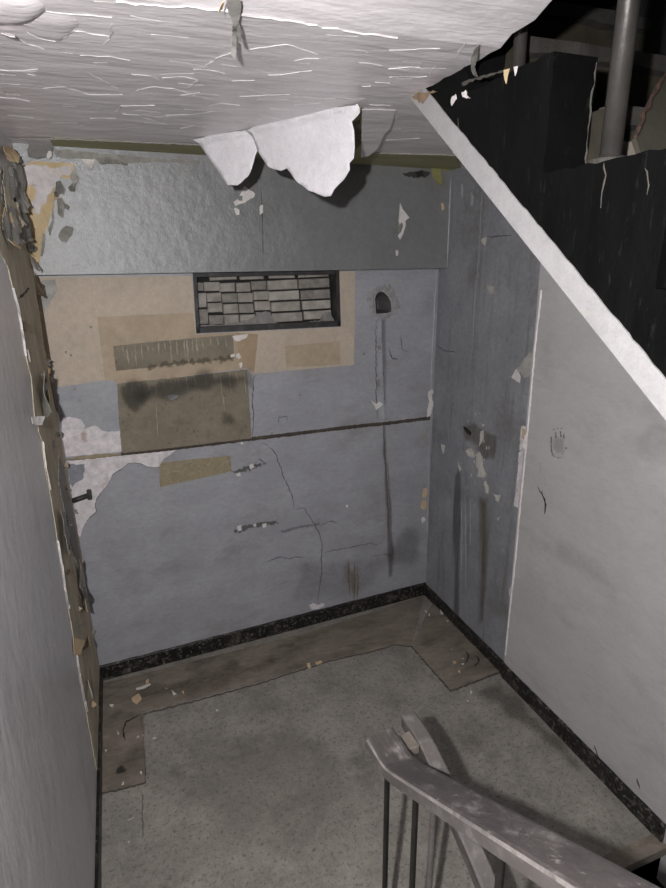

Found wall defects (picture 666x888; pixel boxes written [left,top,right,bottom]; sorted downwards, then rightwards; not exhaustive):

crack [0,1,466,128]
peeling [0,104,461,770]
crack [66,376,430,595]
peeling [458,412,500,502]